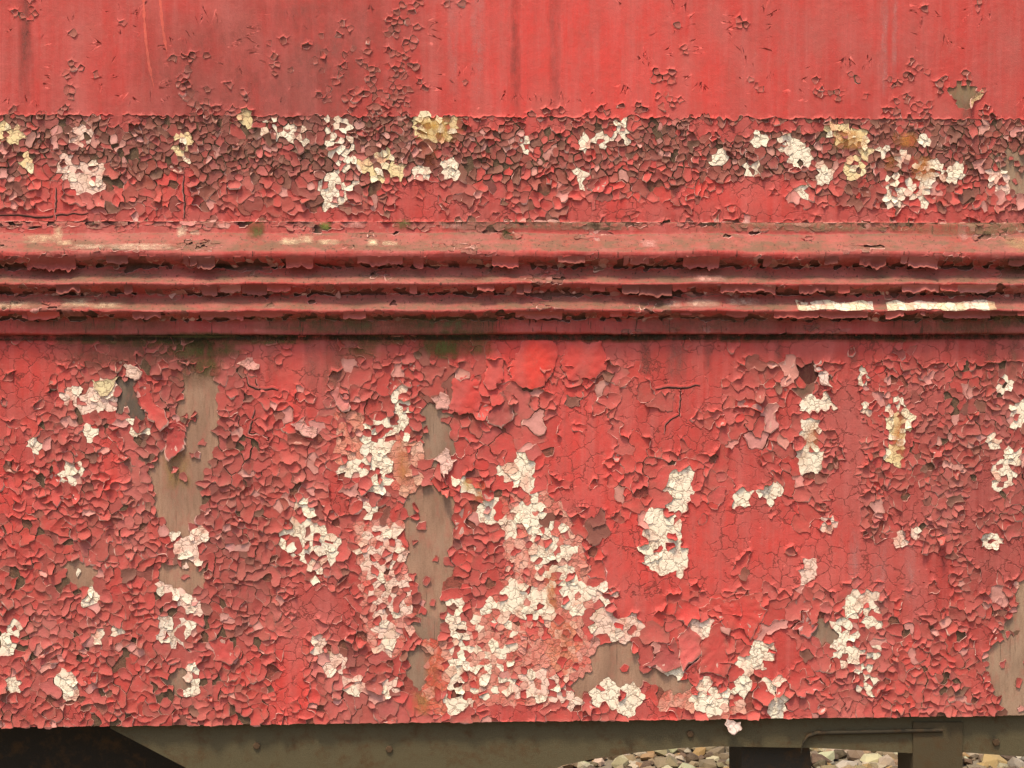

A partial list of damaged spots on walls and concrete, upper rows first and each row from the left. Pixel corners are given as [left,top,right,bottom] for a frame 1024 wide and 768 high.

peeling [0,0,1024,350]
peeling [0,335,1024,735]
crack [655,382,700,434]